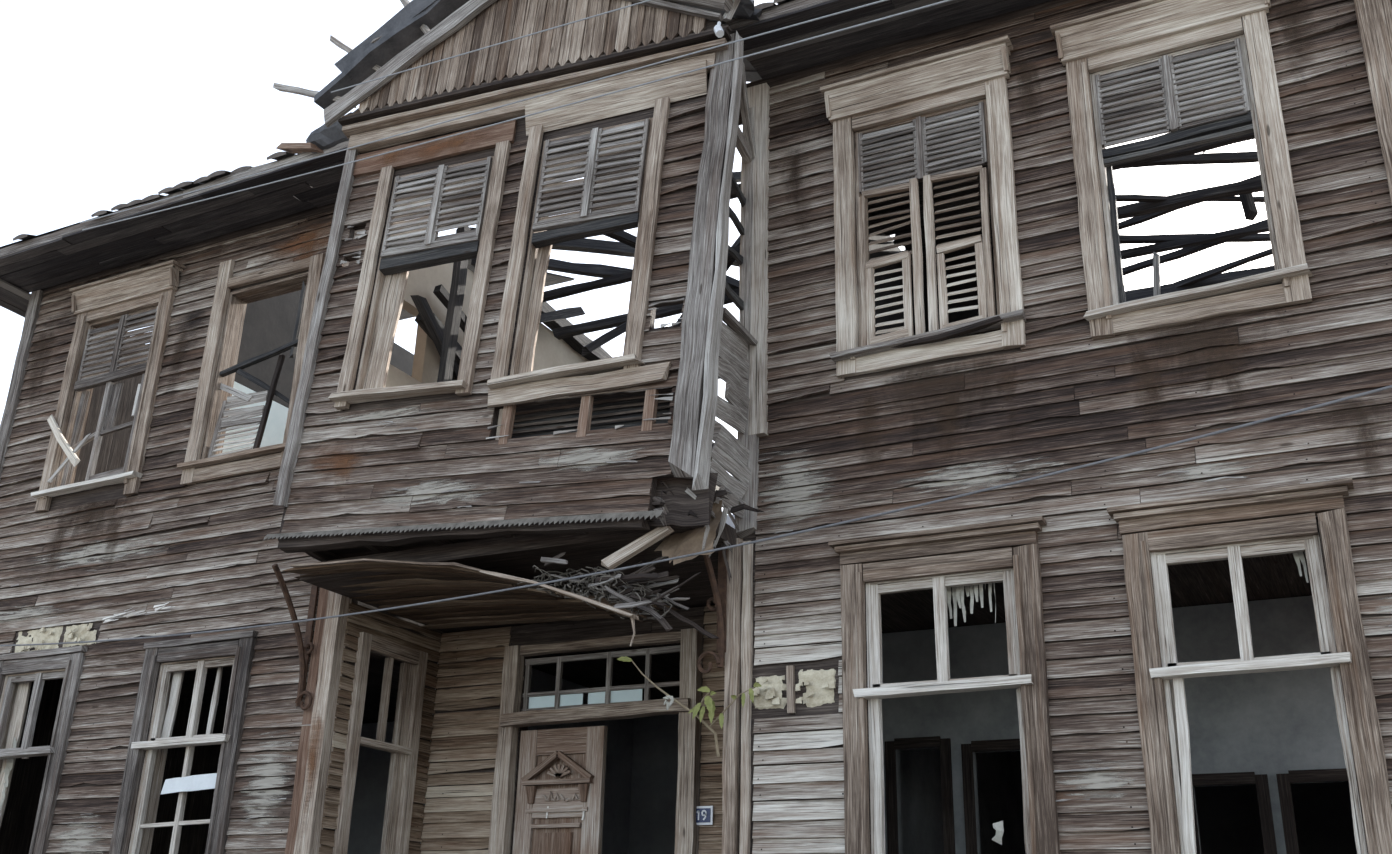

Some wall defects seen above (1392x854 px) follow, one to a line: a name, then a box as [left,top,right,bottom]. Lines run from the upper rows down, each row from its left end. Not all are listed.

flaking render [0,606,97,653]
flaking render [753,669,836,709]